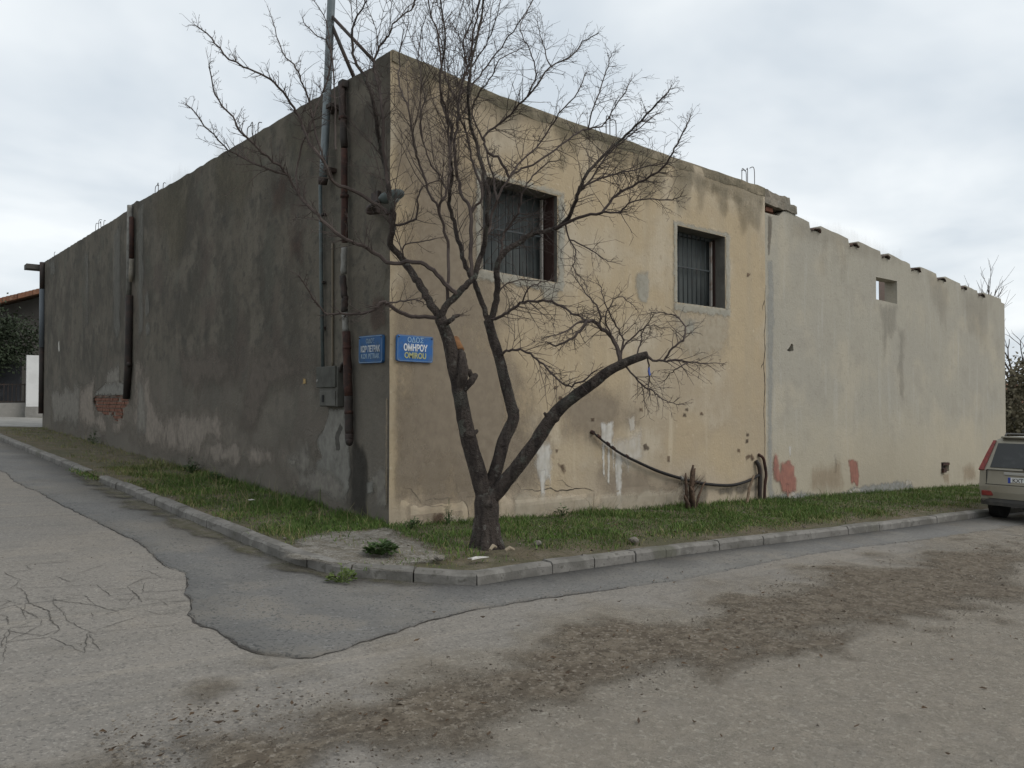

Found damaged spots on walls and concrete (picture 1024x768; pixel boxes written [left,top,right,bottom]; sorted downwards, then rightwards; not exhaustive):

damp [397,78,524,492]
flaking render [50,363,273,466]
damp [524,455,550,495]
damp [567,393,629,497]